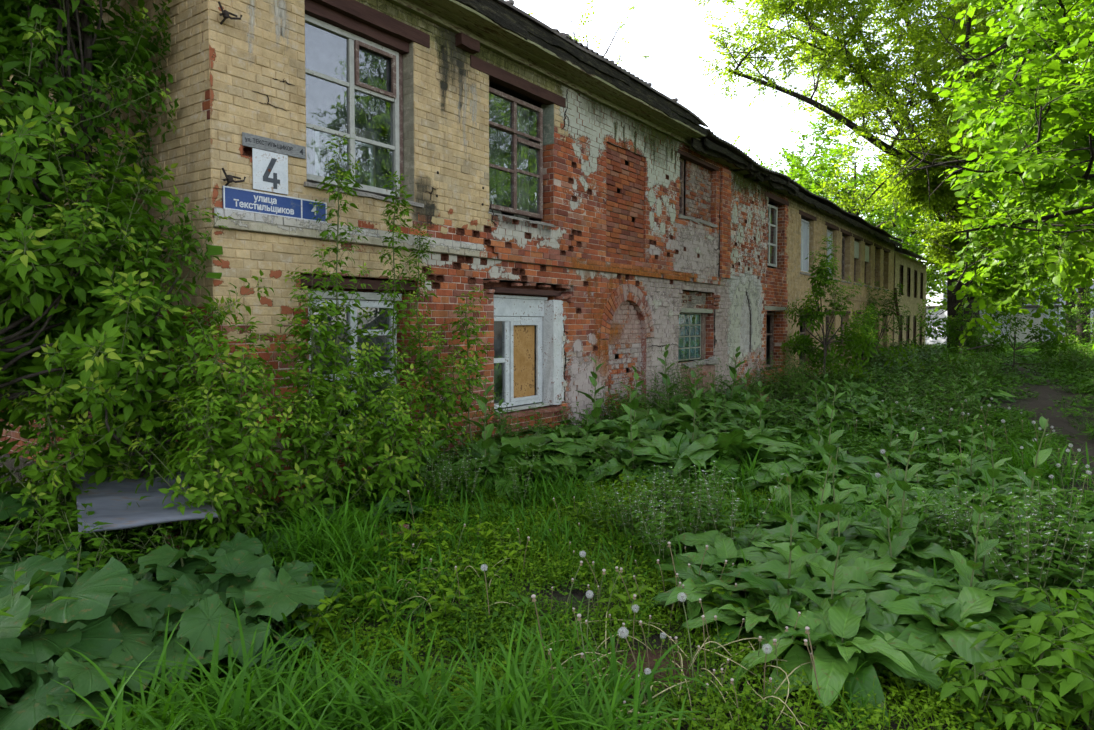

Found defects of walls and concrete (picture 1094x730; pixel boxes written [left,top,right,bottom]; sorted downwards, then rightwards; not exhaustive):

peeling [209,45,217,114]
spalling [239,144,252,162]
peeling [212,184,248,227]
peeling [213,259,230,286]
peeling [262,85,766,402]
peeling [226,286,306,348]
peeling [539,284,609,427]